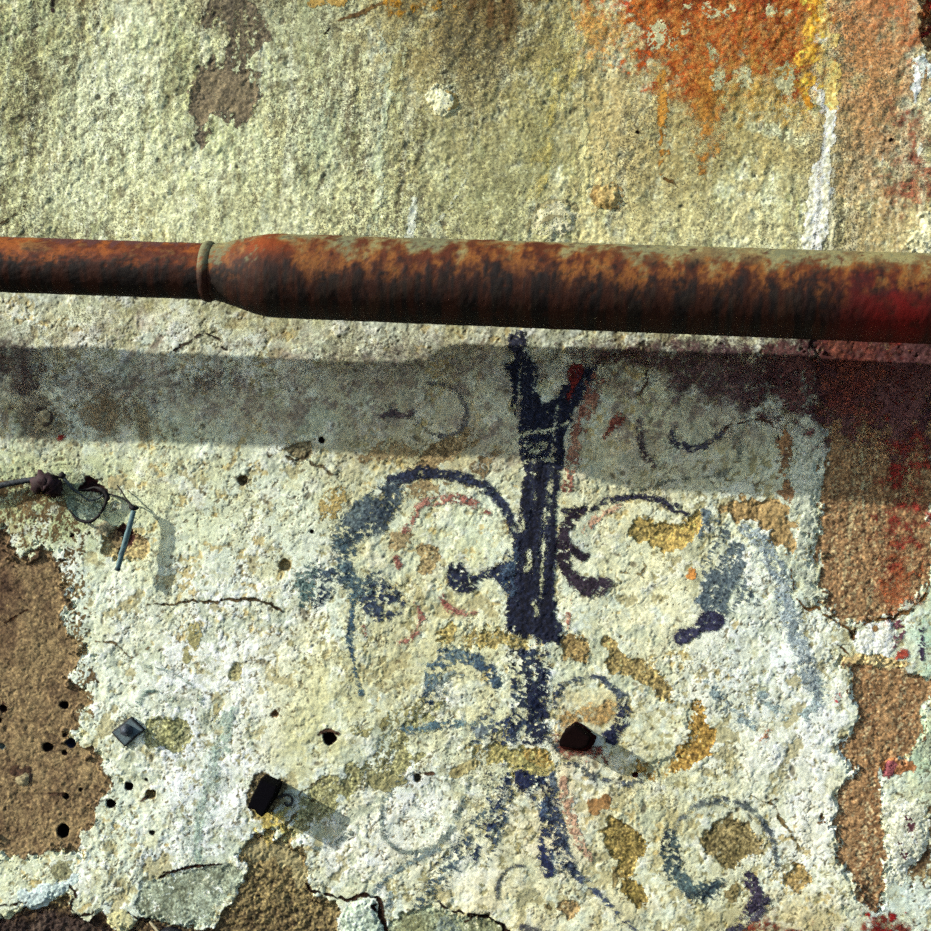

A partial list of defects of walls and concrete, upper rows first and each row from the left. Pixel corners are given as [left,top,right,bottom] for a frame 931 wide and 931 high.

corrosion [307,0,538,44]
corrosion [569,0,836,176]
corrosion [880,99,931,207]
crack [147,597,283,613]
spalling [717,340,931,913]
spalling [0,470,502,931]
peeling [632,700,717,782]
peeling [586,794,649,910]
peeling [699,813,765,870]
crack [69,885,94,917]
crack [305,883,388,931]
crack [435,901,510,931]